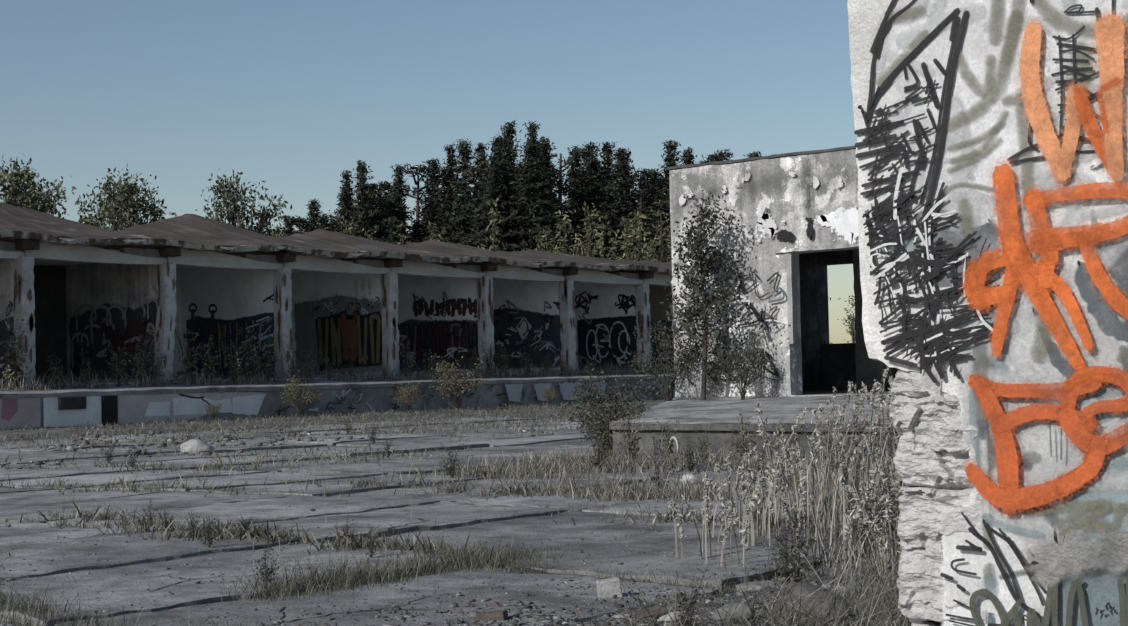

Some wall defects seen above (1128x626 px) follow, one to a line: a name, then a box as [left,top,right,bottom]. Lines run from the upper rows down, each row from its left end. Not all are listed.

peeling [755,207,786,243]
peeling [817,203,859,244]
spalling [877,359,986,626]
crack [266,596,430,626]